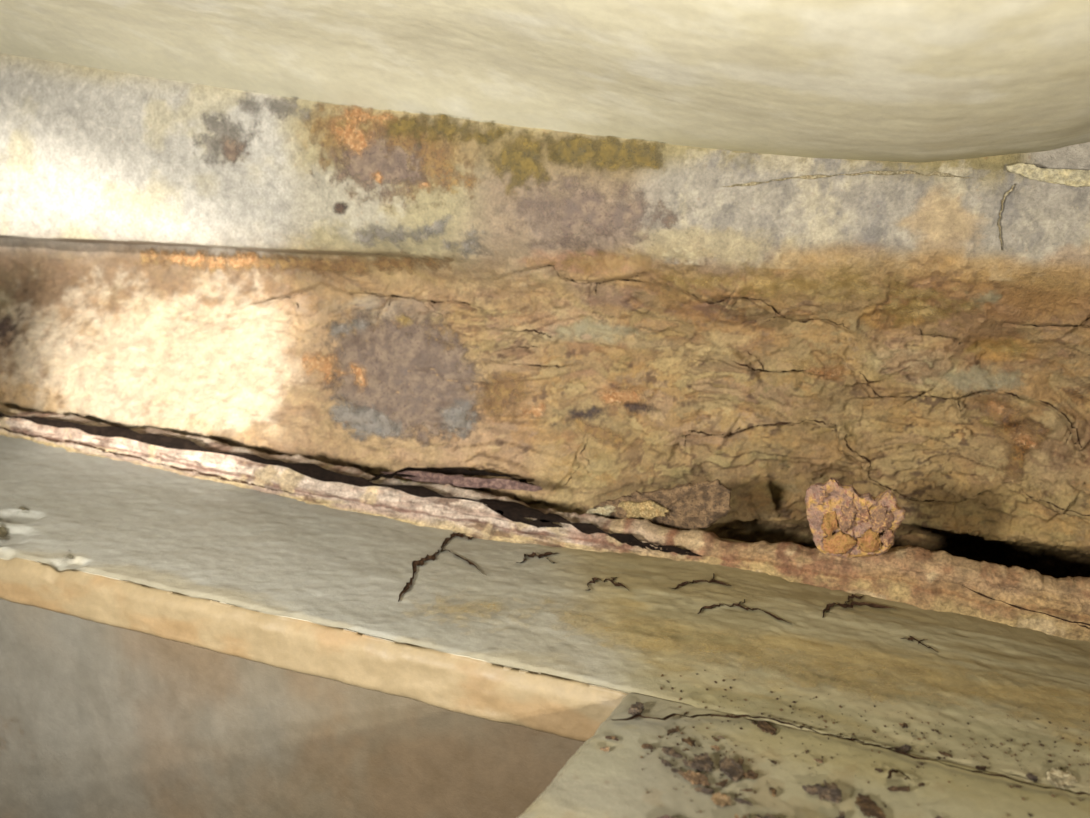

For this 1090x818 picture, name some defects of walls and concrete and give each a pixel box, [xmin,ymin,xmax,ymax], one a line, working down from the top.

damp [478,127,663,192]
crack [687,291,850,330]
crack [734,352,828,376]
crack [859,371,1082,448]
crack [683,419,983,502]
crack [0,412,789,623]
crack [1022,490,1090,516]
peeling [641,726,701,776]
peeling [757,721,777,735]
peeling [694,779,728,795]
peeling [734,758,758,806]